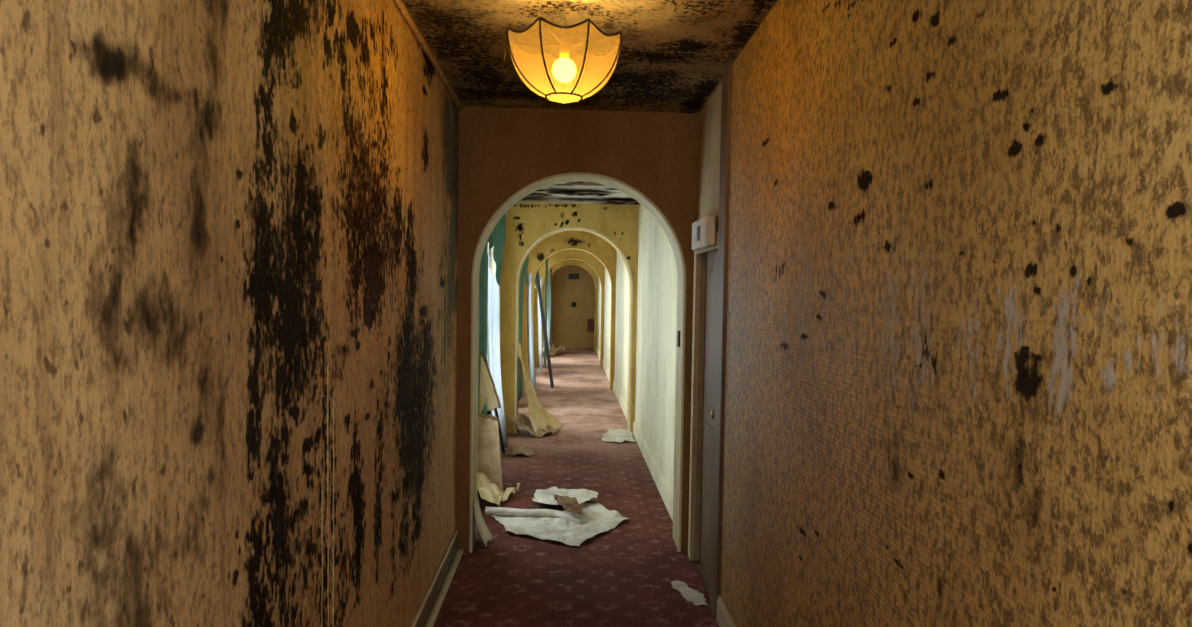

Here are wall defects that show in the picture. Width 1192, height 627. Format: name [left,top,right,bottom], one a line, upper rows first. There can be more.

damp [912,10,940,28]
damp [993,89,1009,102]
damp [1101,81,1117,95]
damp [1007,108,1045,157]
damp [856,169,872,193]
damp [1165,201,1186,219]
damp [233,0,777,627]
damp [775,186,858,389]
damp [871,230,938,414]
damp [957,263,1091,414]
damp [1103,335,1156,387]
peeling [518,343,563,433]